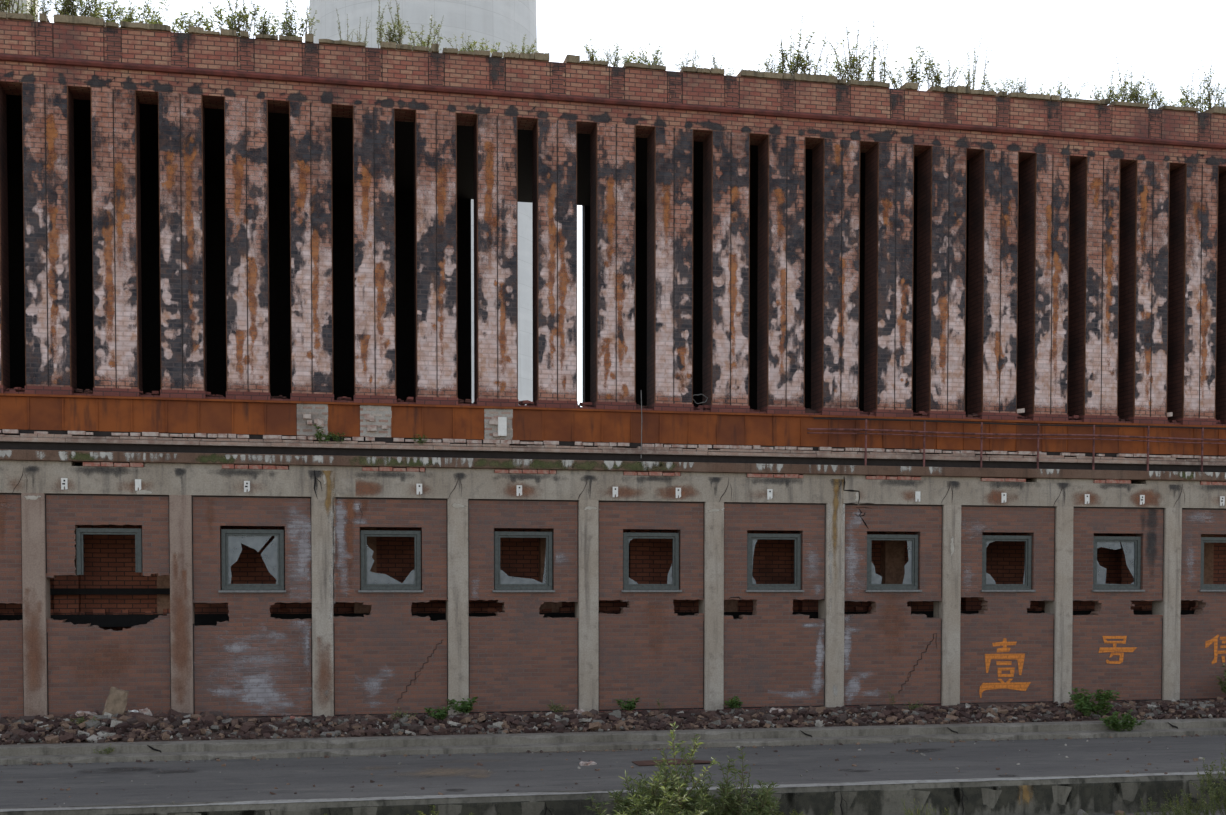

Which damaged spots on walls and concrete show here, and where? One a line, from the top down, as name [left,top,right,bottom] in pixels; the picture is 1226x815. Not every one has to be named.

water stain [93,187,137,379]
water stain [227,163,269,384]
water stain [291,194,332,385]
water stain [354,201,395,387]
water stain [417,184,457,389]
water stain [598,230,635,394]
water stain [656,227,692,396]
water stain [713,187,749,397]
water stain [824,271,858,400]
water stain [931,232,965,403]
water stain [983,215,1017,404]
water stain [1085,268,1118,408]